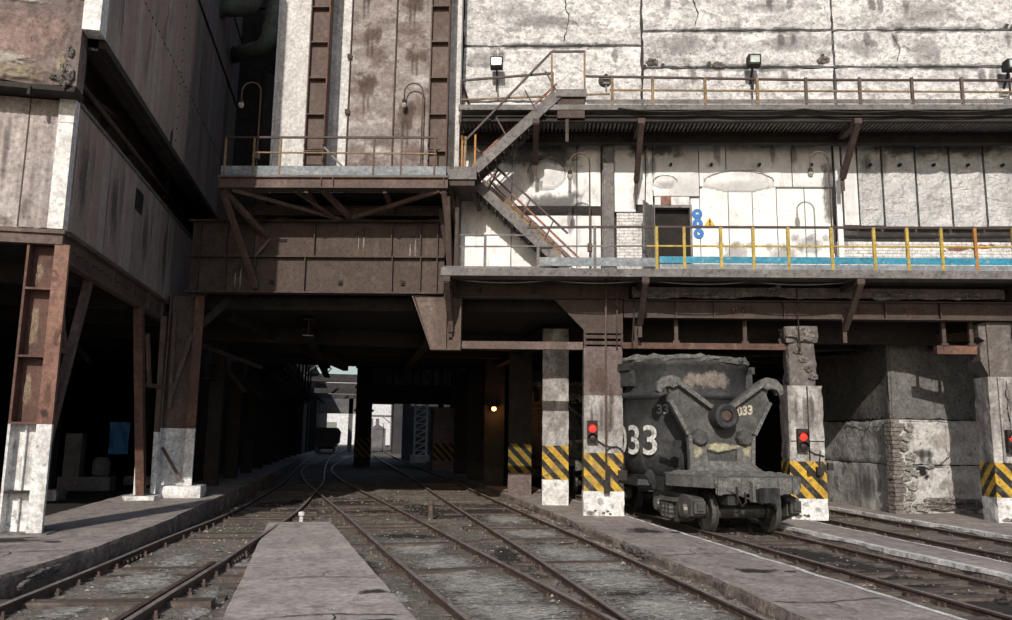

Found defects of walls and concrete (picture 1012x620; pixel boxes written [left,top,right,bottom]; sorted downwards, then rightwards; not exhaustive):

corrosion [365,28,381,41]
corrosion [406,50,426,59]
corrosion [359,77,376,93]
corrosion [400,103,413,127]
corrosion [28,308,39,344]
spalling [786,327,818,380]
corrosion [22,374,31,410]